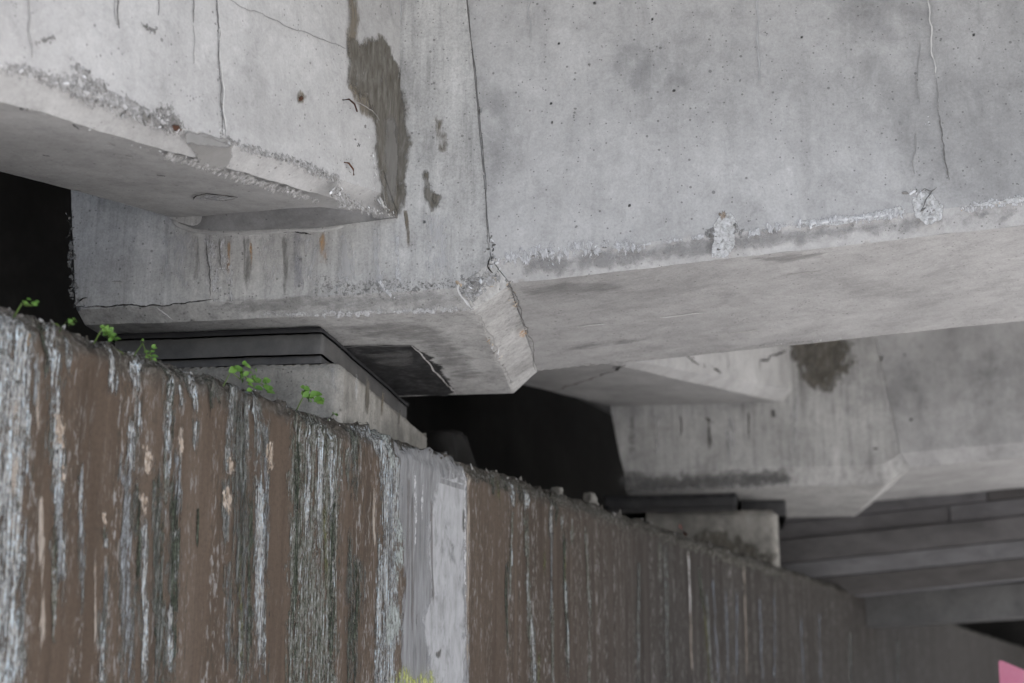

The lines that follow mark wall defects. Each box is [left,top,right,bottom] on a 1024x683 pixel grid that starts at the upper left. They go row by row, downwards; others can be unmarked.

spalling [0,57,184,136]
crack [78,281,218,320]
spalling [126,98,397,219]
crack [193,0,342,139]
leakage [259,0,473,318]
crack [467,1,625,392]
spalling [705,211,744,259]
leakage [790,340,855,392]
spalling [902,187,944,225]
crack [912,0,949,177]
leakage [0,314,270,683]
leakage [285,345,471,683]